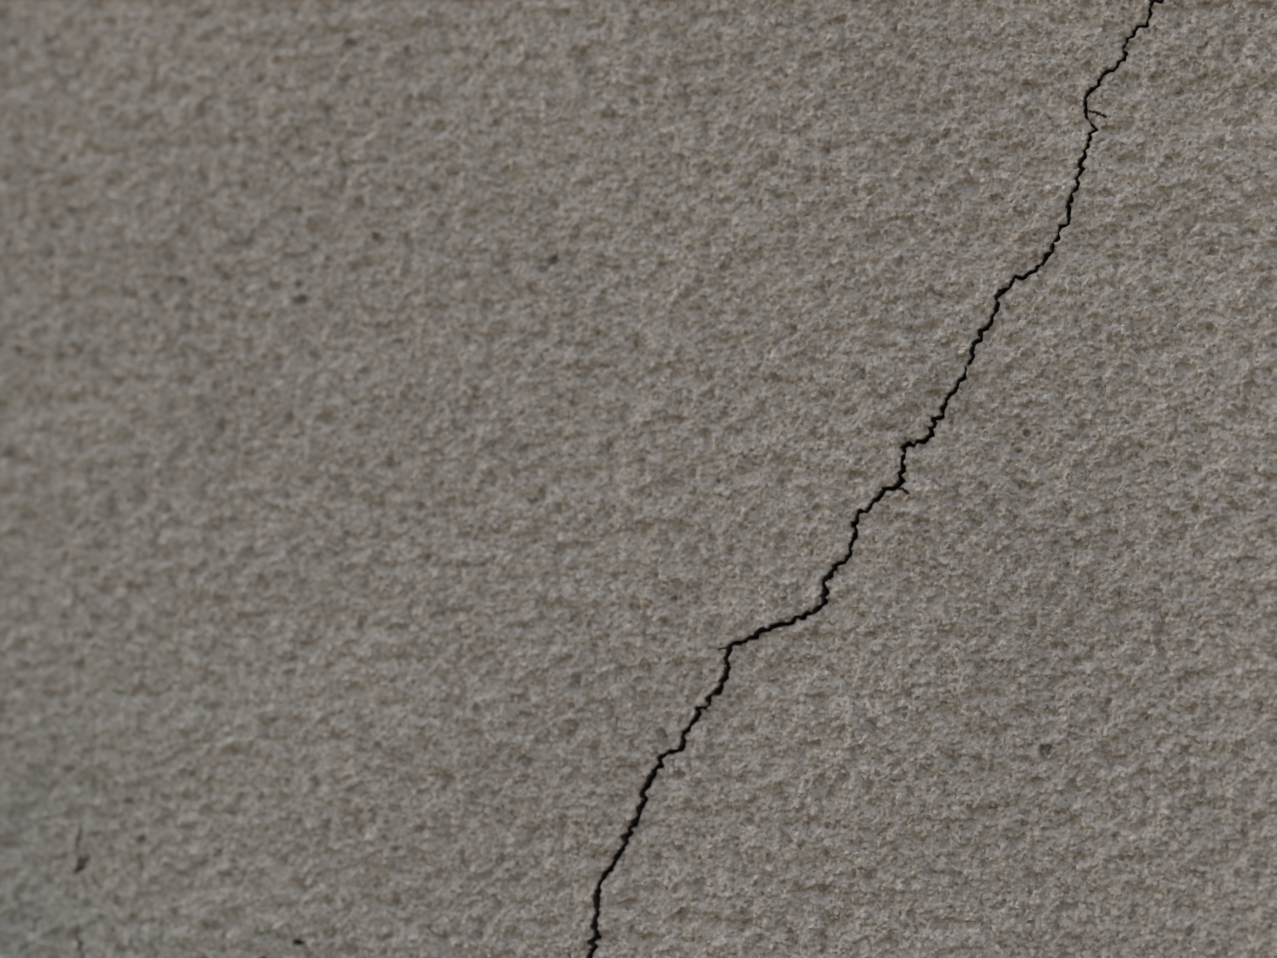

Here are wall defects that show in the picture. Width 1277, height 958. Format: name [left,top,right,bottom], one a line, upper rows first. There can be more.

crack [568,0,1164,958]